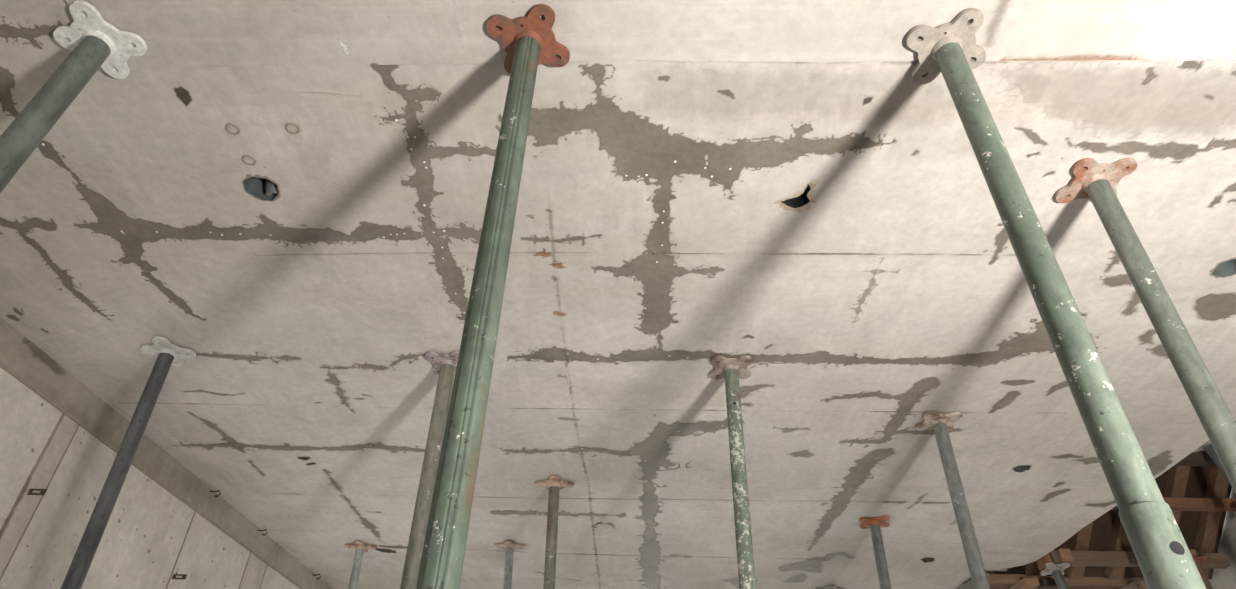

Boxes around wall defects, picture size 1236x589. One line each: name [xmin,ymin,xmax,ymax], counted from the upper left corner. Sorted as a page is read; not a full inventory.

water stain [0,17,68,49]
water stain [1180,61,1202,71]
water stain [0,67,19,118]
spalling [174,87,192,106]
water stain [1066,138,1236,163]
water stain [37,64,496,323]
spalling [773,180,818,213]
water stain [1208,183,1236,208]
water stain [0,218,114,320]
water stain [1195,293,1236,320]
water stain [491,64,1054,589]
water stain [176,412,425,476]